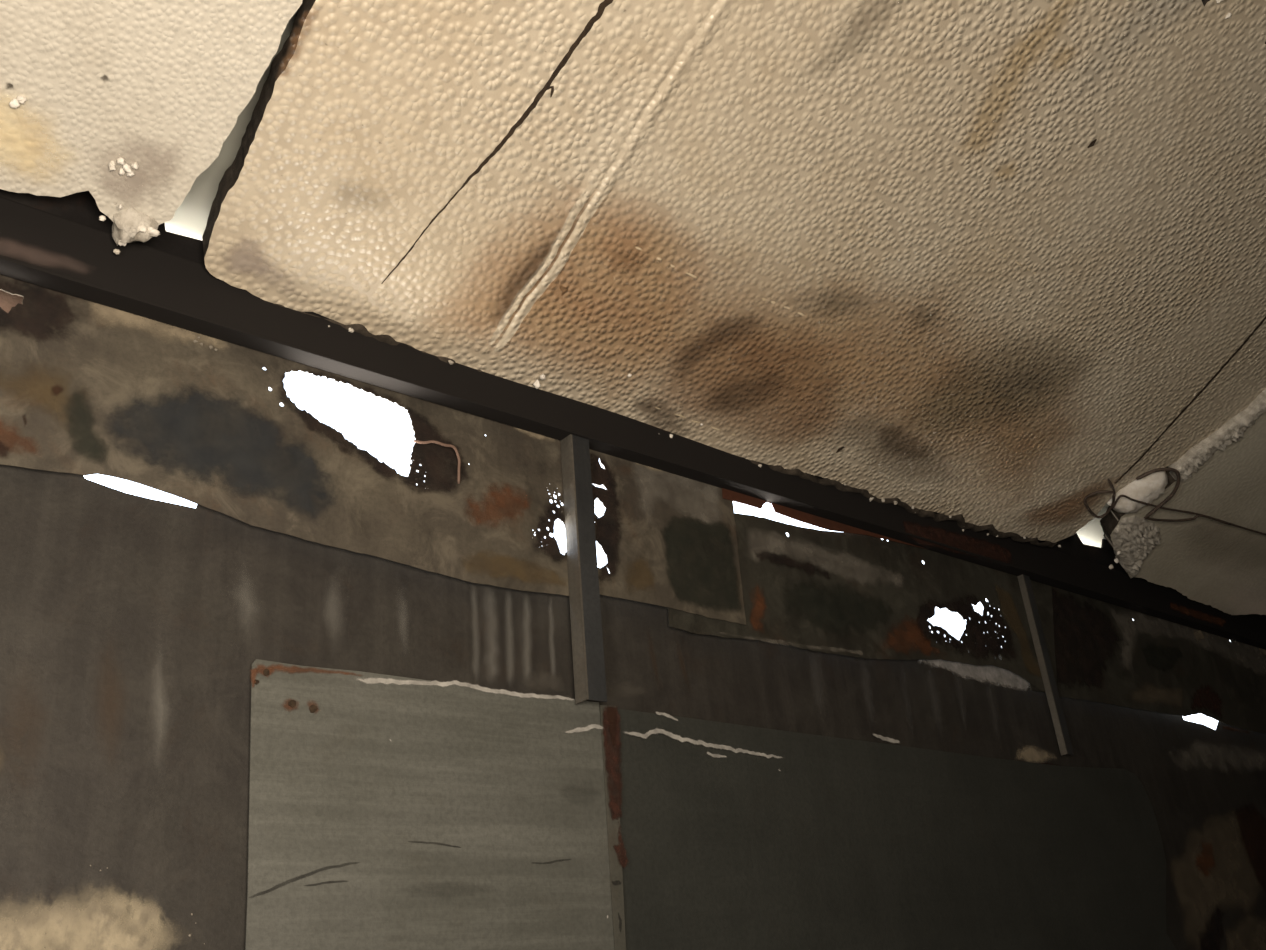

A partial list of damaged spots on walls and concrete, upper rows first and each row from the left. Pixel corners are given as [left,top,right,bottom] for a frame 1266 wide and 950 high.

crack [381,0,613,284]
spalling [99,204,160,255]
water stain [113,389,331,516]
water stain [693,321,1043,456]
crack [1115,316,1266,484]
spalling [1105,510,1161,578]
rust [284,700,318,713]
rust [603,707,628,885]